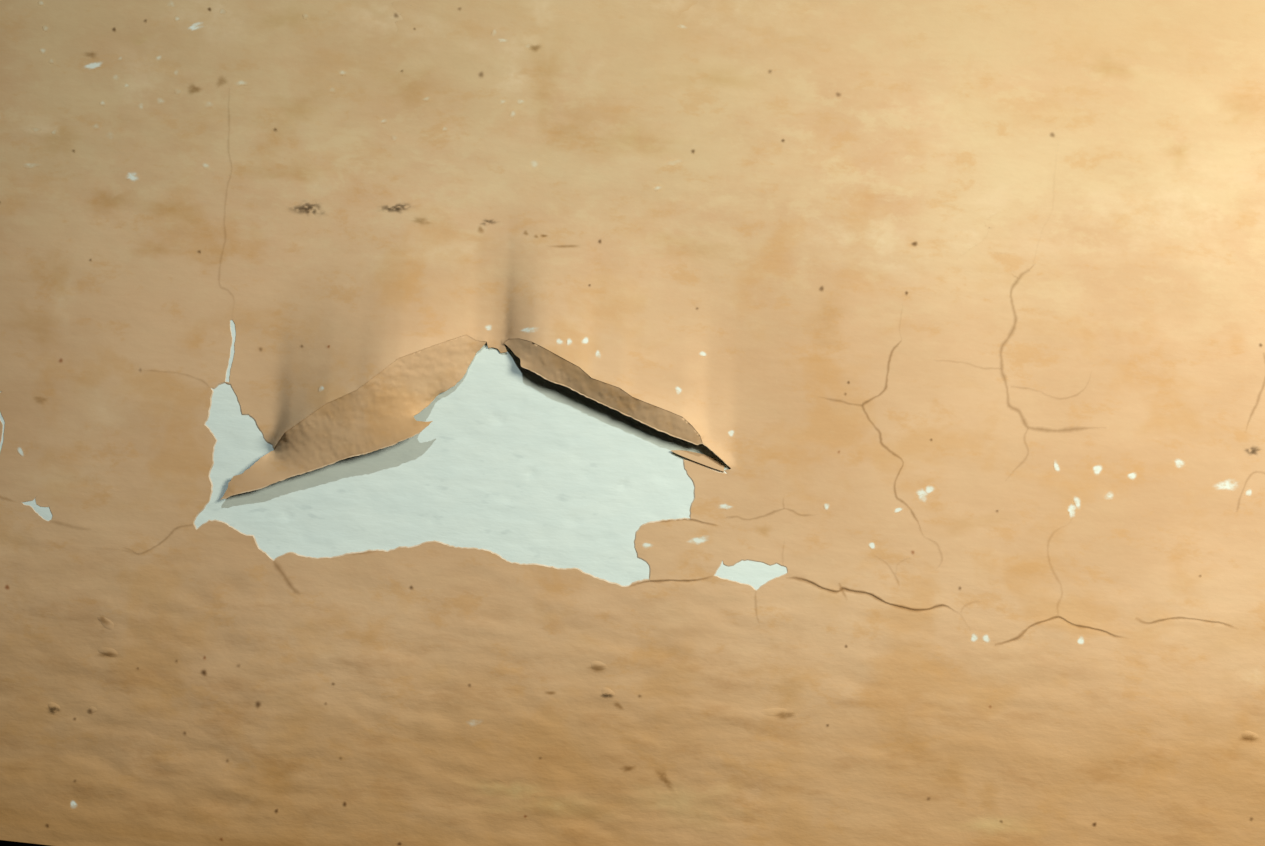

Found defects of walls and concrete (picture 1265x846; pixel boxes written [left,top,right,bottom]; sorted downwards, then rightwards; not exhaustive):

peeling [193,324,731,587]
peeling [22,497,53,521]
peeling [714,559,788,591]